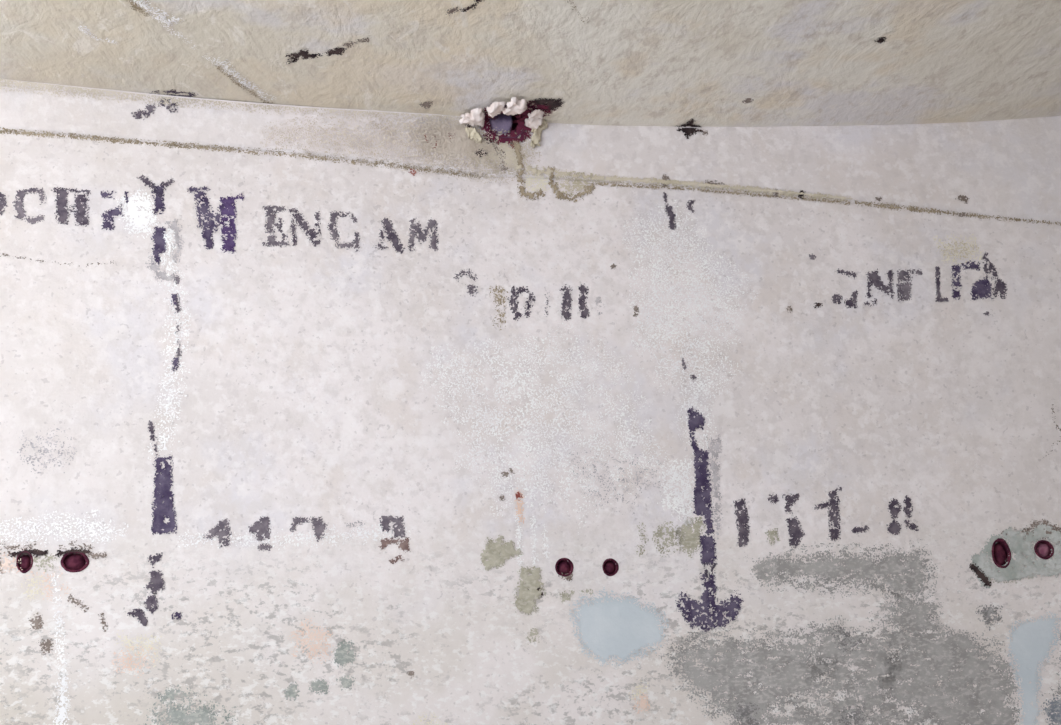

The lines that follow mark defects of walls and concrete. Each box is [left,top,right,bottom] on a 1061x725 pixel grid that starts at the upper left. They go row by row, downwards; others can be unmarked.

crack [126,0,276,104]
spalling [424,97,595,203]